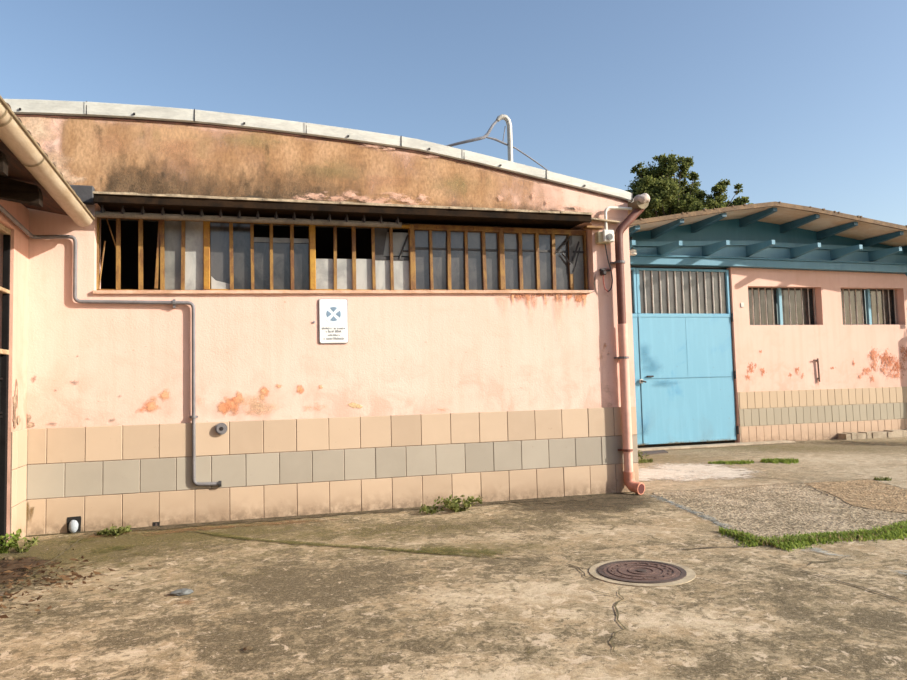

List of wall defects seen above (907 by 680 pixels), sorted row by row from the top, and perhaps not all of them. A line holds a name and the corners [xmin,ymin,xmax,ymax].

leakage [61,118,575,211]
peeling [295,190,426,205]
corrosion [510,294,586,305]
peeling [853,346,907,381]
peeling [140,391,169,411]
peeling [218,385,280,414]